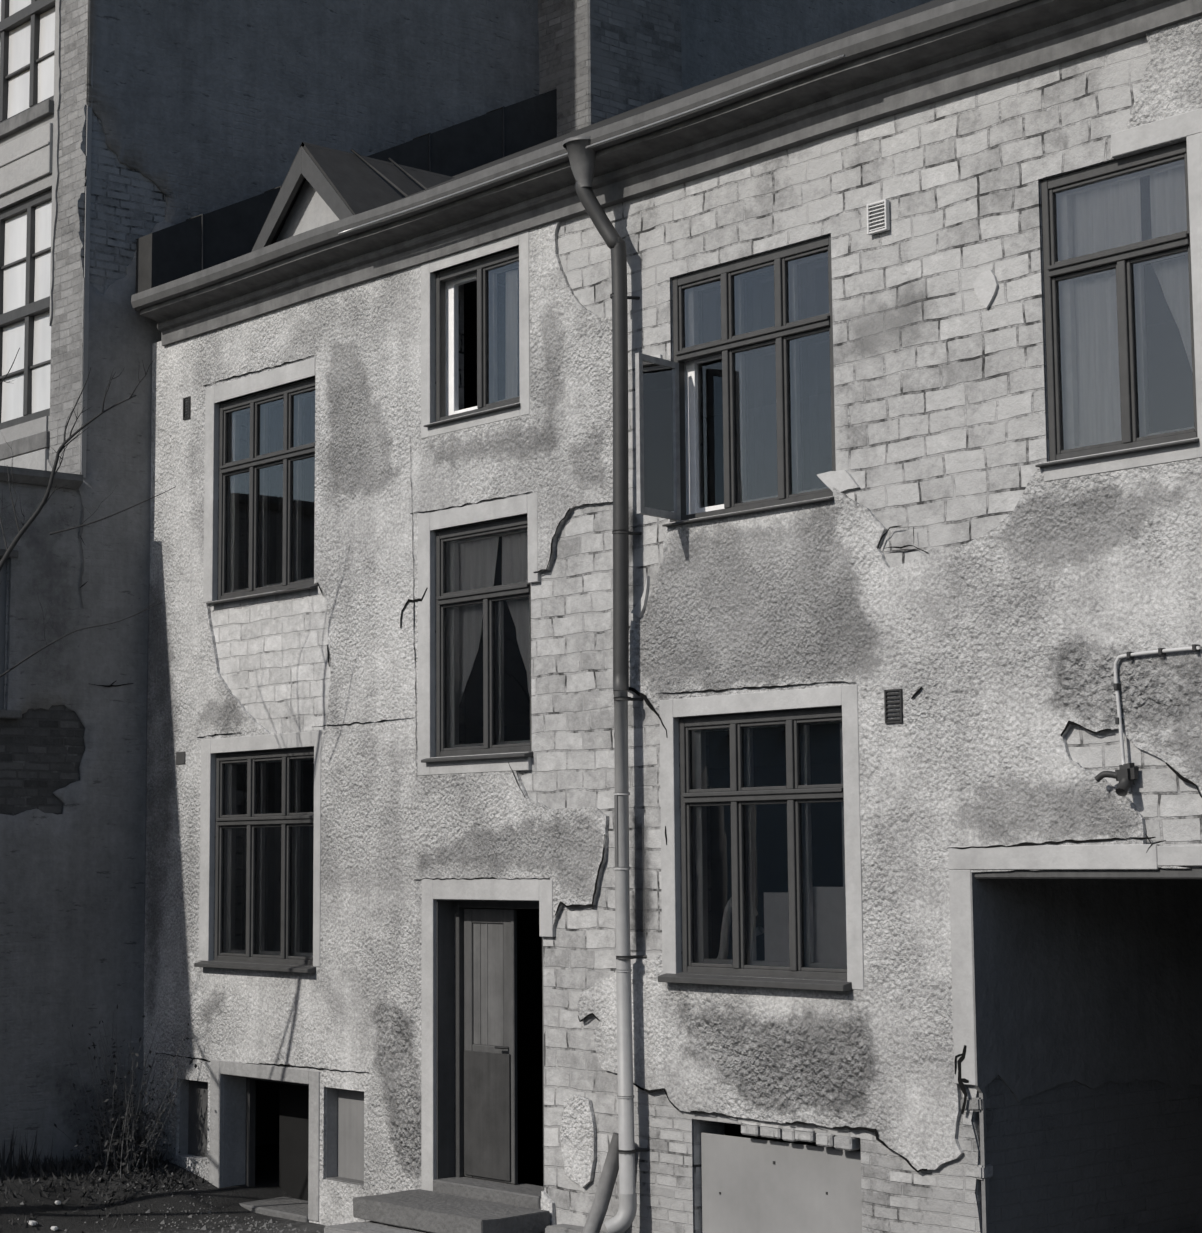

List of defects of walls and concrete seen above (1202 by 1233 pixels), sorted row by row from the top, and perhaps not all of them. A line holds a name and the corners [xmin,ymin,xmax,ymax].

flaking render [47,0,88,474]
flaking render [0,705,86,816]
flaking render [204,582,330,734]
flaking render [420,37,1202,1233]